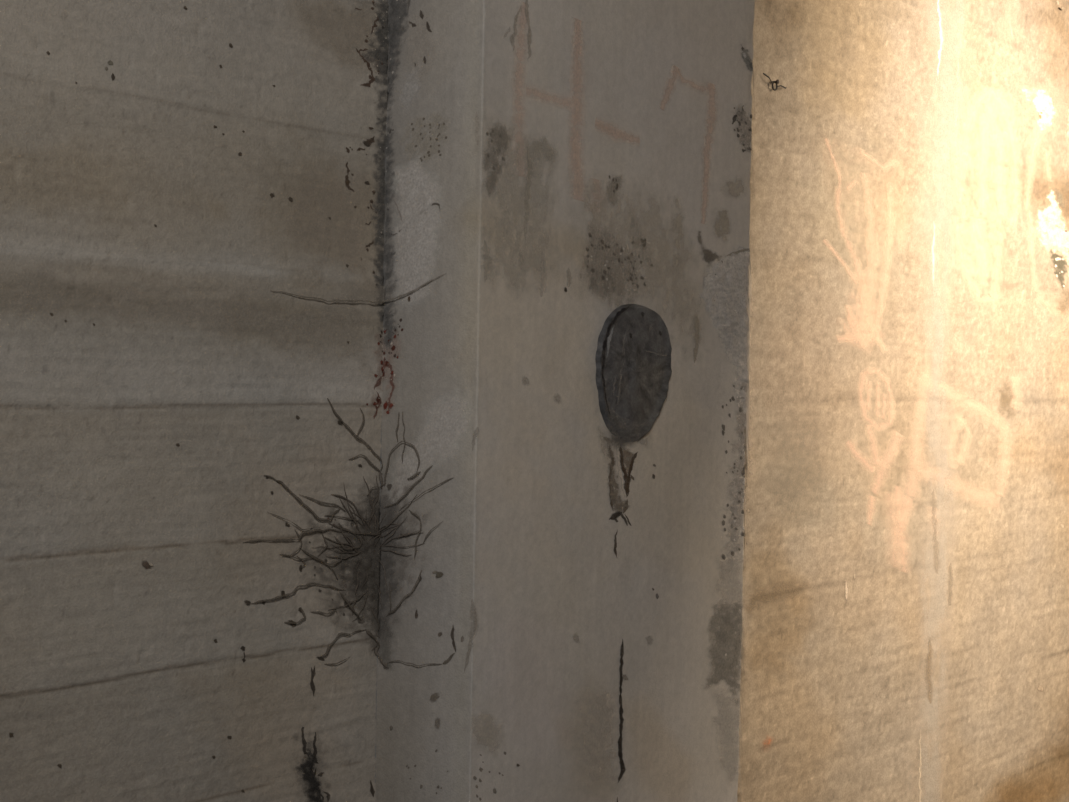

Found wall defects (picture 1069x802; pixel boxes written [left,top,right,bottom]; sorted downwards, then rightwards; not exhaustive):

damp [345,0,447,348]
corrosion [366,319,403,418]
damp [919,0,964,802]
crack [308,666,316,696]
crack [297,727,330,802]
crack [585,639,628,802]